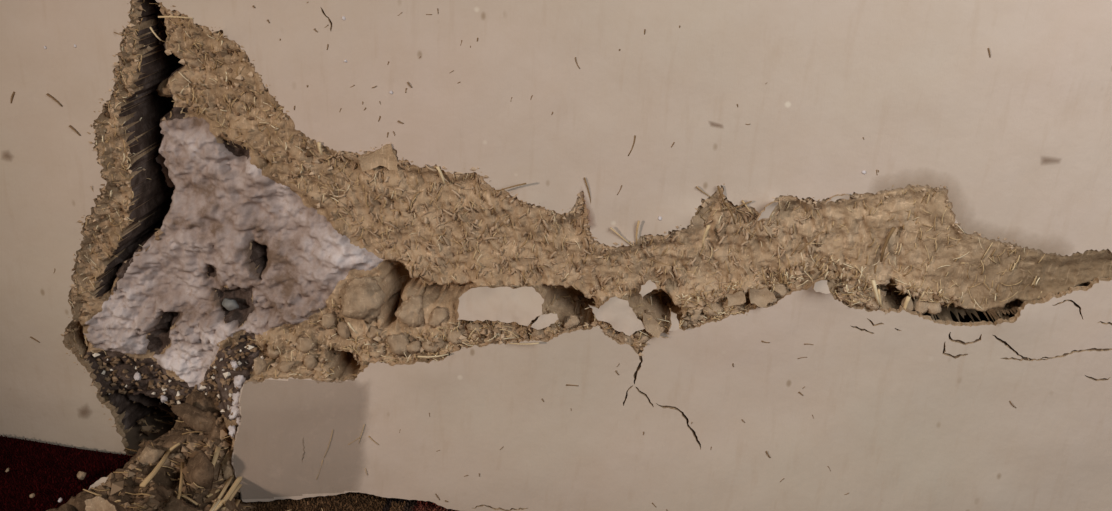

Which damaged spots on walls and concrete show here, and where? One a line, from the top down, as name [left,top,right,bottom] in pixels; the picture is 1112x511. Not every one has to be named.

spalling [60,0,361,486]
crack [623,350,701,446]
spalling [326,144,1112,377]
crack [943,322,1112,380]